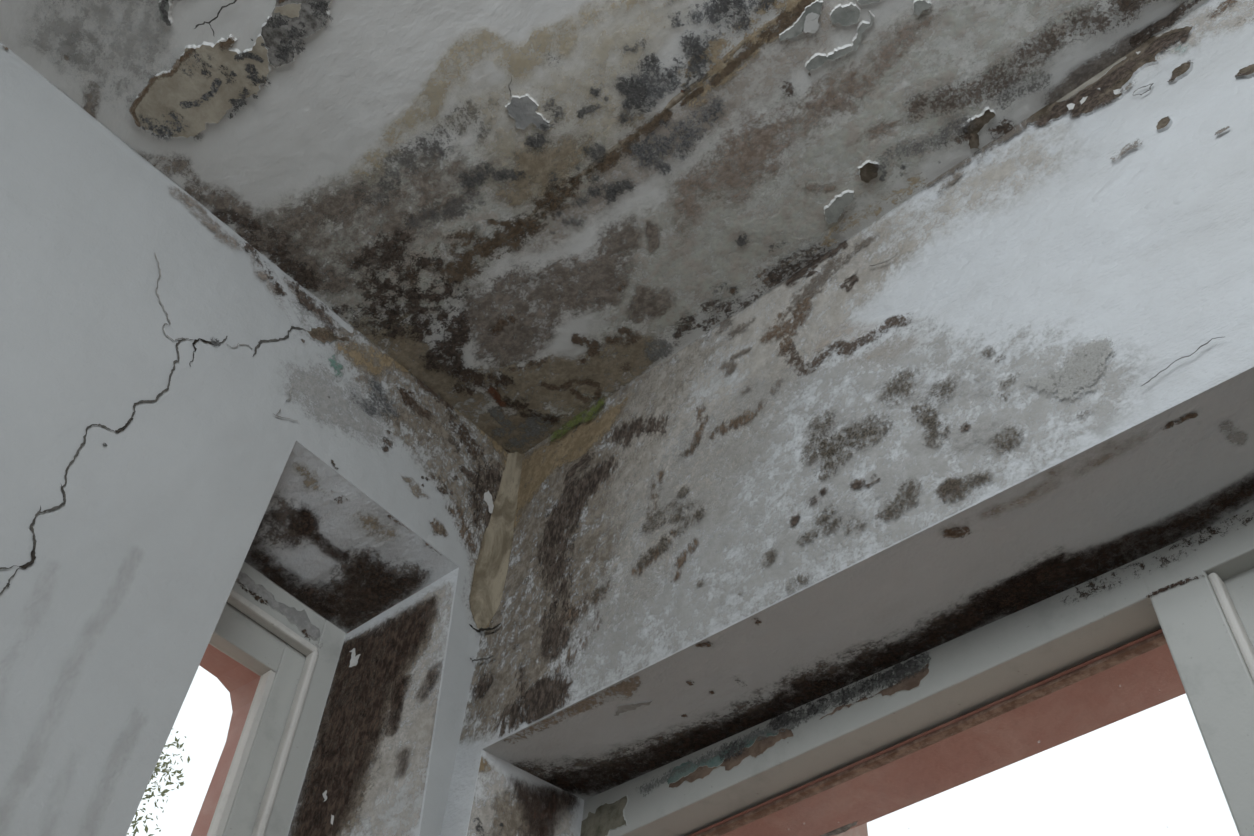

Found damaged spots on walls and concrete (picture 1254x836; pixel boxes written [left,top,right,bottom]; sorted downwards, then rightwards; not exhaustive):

water stain [34,0,165,117]
peeling [129,0,333,139]
peeling [505,77,566,132]
peeling [779,0,880,76]
flaking render [925,26,1195,193]
peeling [824,160,906,233]
crack [0,254,306,594]
water stain [139,0,1254,744]
water stain [245,496,450,836]
peeling [580,653,931,836]
water stain [467,475,1254,836]